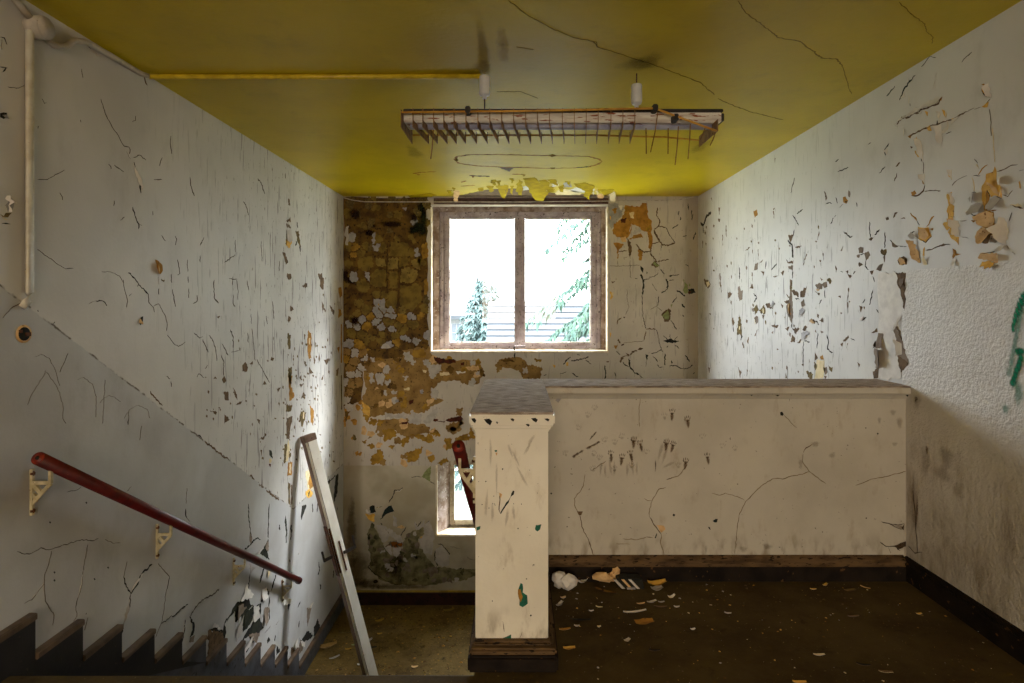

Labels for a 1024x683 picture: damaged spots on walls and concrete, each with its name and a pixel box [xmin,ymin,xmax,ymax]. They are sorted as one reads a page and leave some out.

crack [508,0,783,120]
crack [738,1,852,94]
crack [101,101,172,180]
crack [89,201,274,383]
crack [544,208,695,379]
peeling [661,163,1023,380]
crack [27,354,172,437]
crack [17,538,219,643]
leakage [347,508,417,589]
flaking render [205,177,664,659]
crack [625,469,684,553]
crack [713,399,826,548]